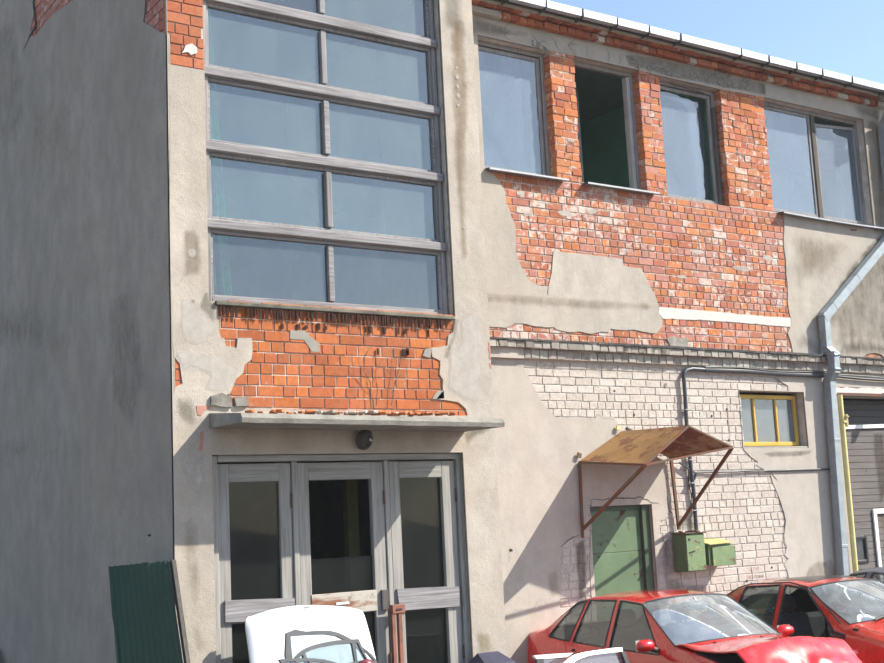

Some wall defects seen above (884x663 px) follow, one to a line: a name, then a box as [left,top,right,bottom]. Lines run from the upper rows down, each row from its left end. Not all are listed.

peeling [30,0,73,37]
peeling [145,0,204,70]
peeling [196,300,467,416]
peeling [471,0,884,637]